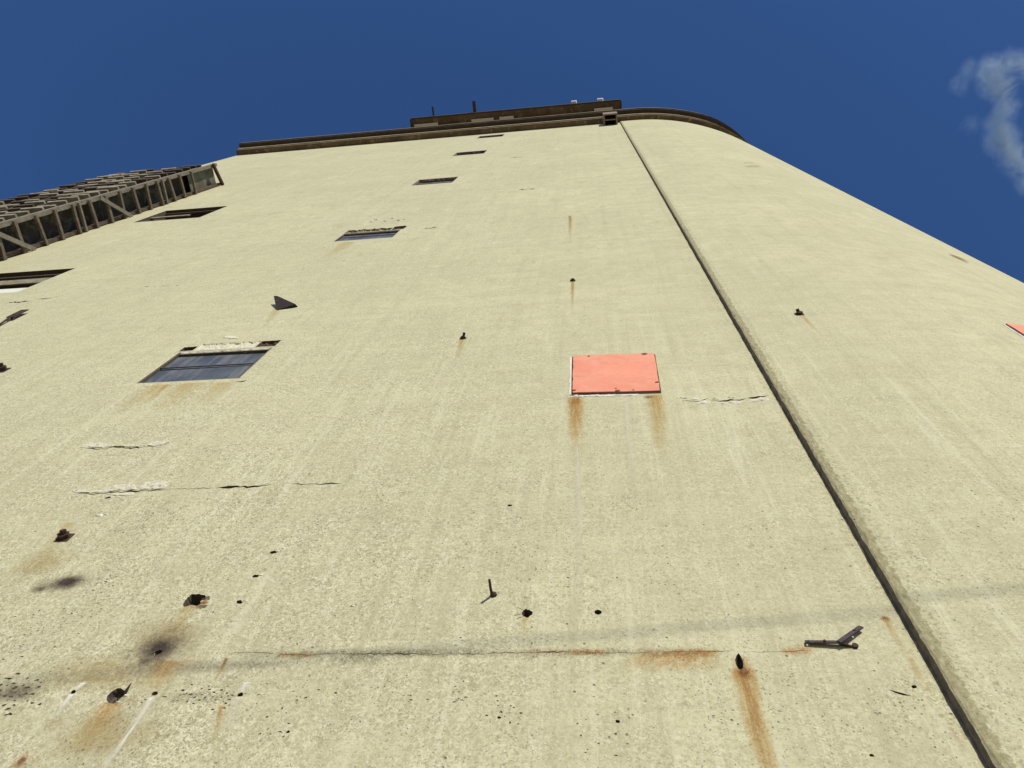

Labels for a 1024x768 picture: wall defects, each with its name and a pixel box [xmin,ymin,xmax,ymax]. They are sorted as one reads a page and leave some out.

crack [680,396,769,405]
spalling [73,480,169,499]
crack [83,483,339,495]
spalling [183,594,210,609]
crack [235,650,440,658]
crack [465,649,754,657]